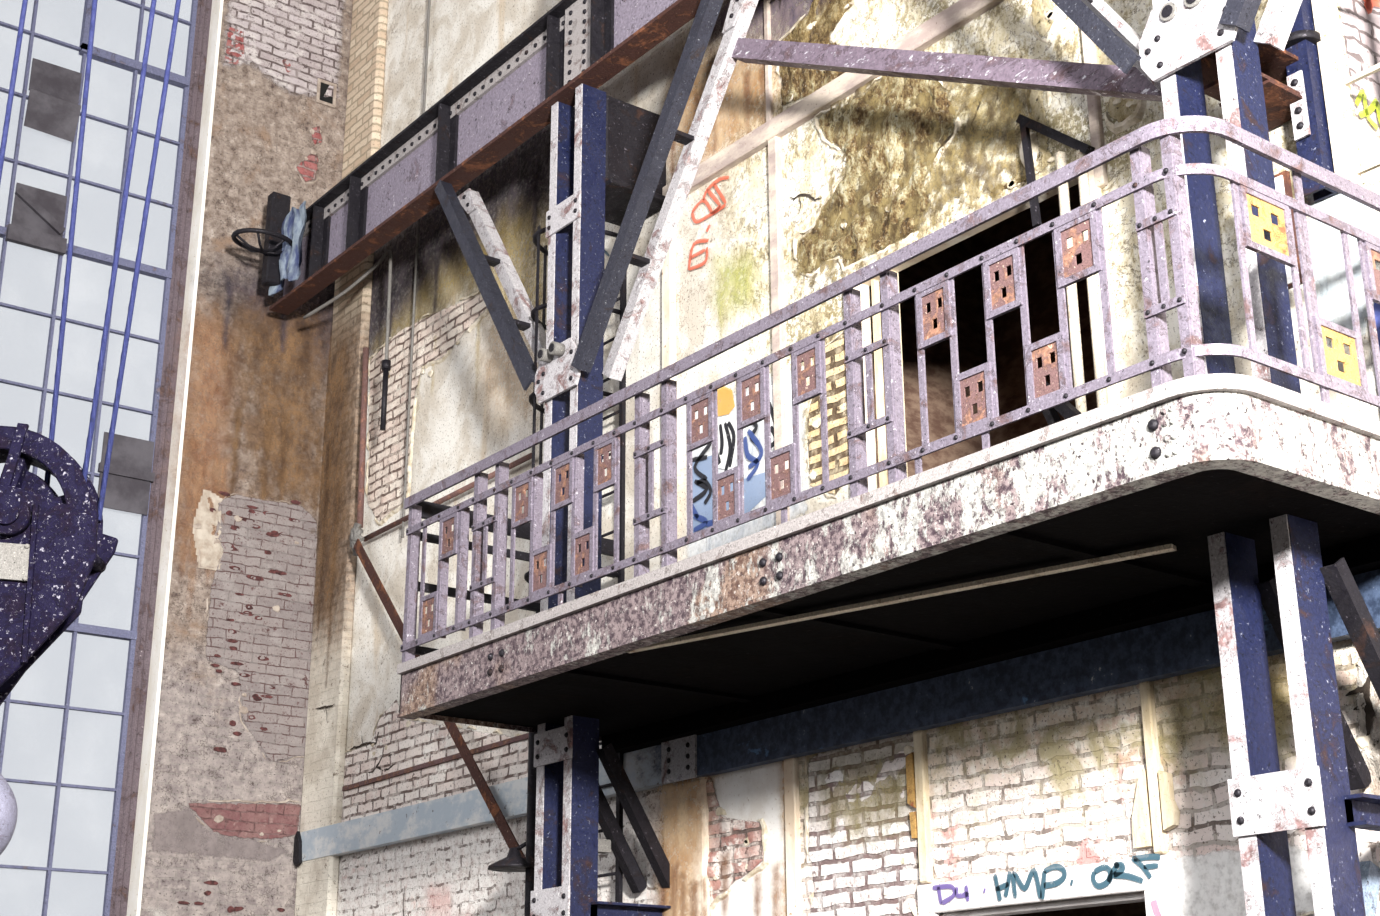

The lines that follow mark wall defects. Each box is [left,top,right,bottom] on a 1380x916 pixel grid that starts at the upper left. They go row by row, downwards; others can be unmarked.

flaking render [224,0,345,97]
spalling [775,66,845,109]
spalling [779,0,862,45]
spalling [792,76,962,278]
spalling [990,89,1054,197]
spalling [1030,0,1057,44]
leakage [224,280,350,636]
spalling [365,291,489,526]
spalling [192,490,317,762]
rust [660,778,727,916]
spalling [706,778,770,914]
rust [755,862,787,916]